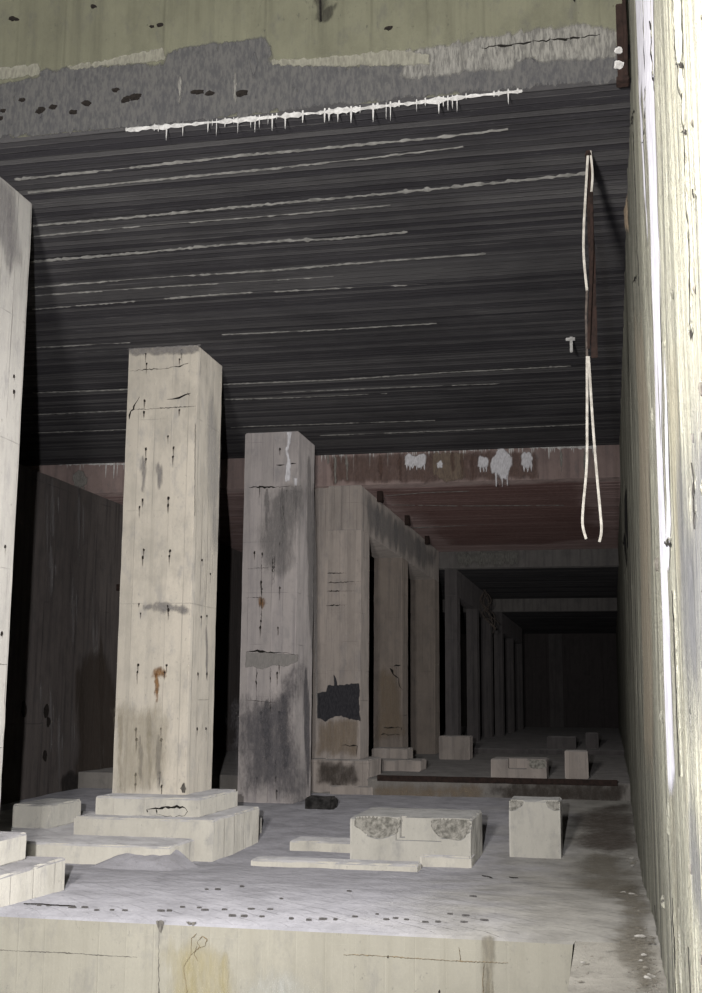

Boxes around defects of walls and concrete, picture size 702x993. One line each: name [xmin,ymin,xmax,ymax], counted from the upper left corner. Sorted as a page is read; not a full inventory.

peeling [68,48,165,70]
peeling [272,50,429,67]
water stain [0,23,624,139]
crack [630,0,697,340]
crack [129,398,194,419]
water stain [231,420,597,799]
rust [154,668,166,697]
peeling [317,676,360,721]
crack [146,805,188,817]
spalling [354,816,401,839]
spalling [431,818,471,840]
crack [24,900,75,908]